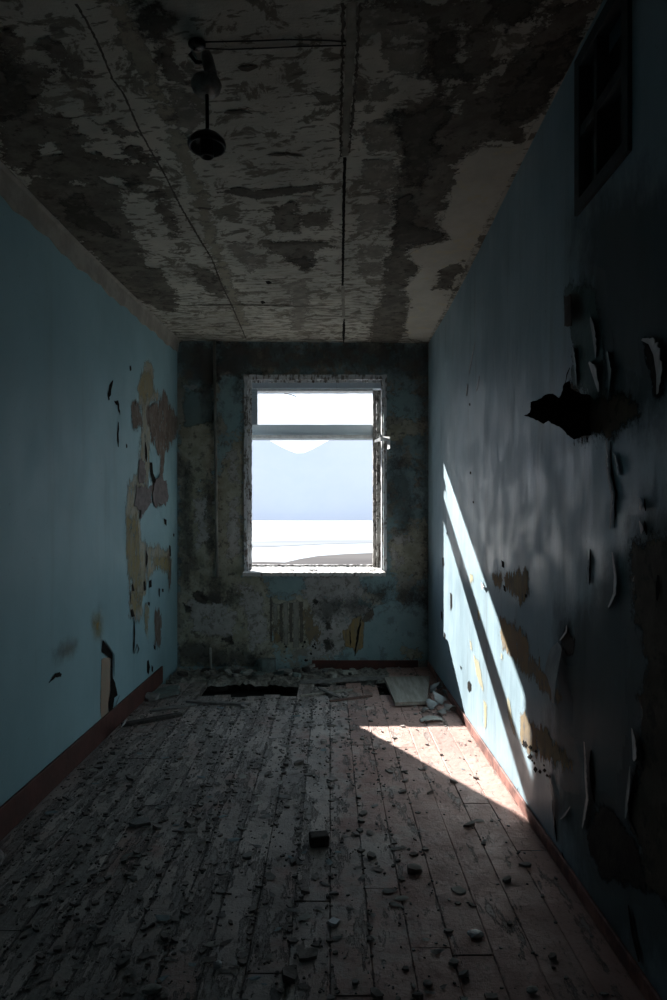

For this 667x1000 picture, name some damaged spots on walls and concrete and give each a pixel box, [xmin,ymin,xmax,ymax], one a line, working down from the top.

water stain [132,0,180,43]
flaking render [524,280,641,529]
peeling [641,336,665,399]
flaking render [125,361,428,667]
peeling [470,560,530,608]
peeling [100,640,120,718]
peeling [467,642,487,728]
peeling [499,616,575,705]